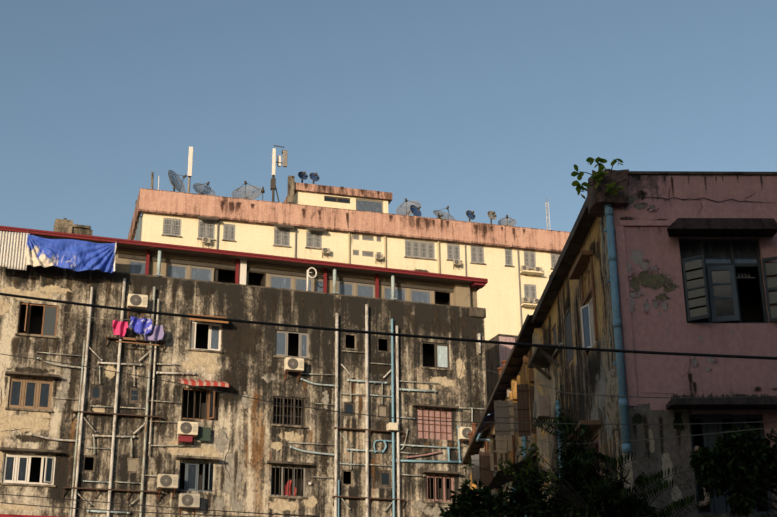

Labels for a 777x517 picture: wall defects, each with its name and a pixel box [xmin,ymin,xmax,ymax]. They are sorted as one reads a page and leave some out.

crack [642,179,771,214]
damp [133,280,153,298]
damp [171,284,192,317]
peeling [626,249,679,315]
damp [4,278,77,422]
damp [222,291,291,409]
damp [544,282,600,422]
damp [8,431,49,443]
damp [154,383,169,435]
damp [312,370,332,484]
damp [57,447,66,492]
damp [207,452,238,512]